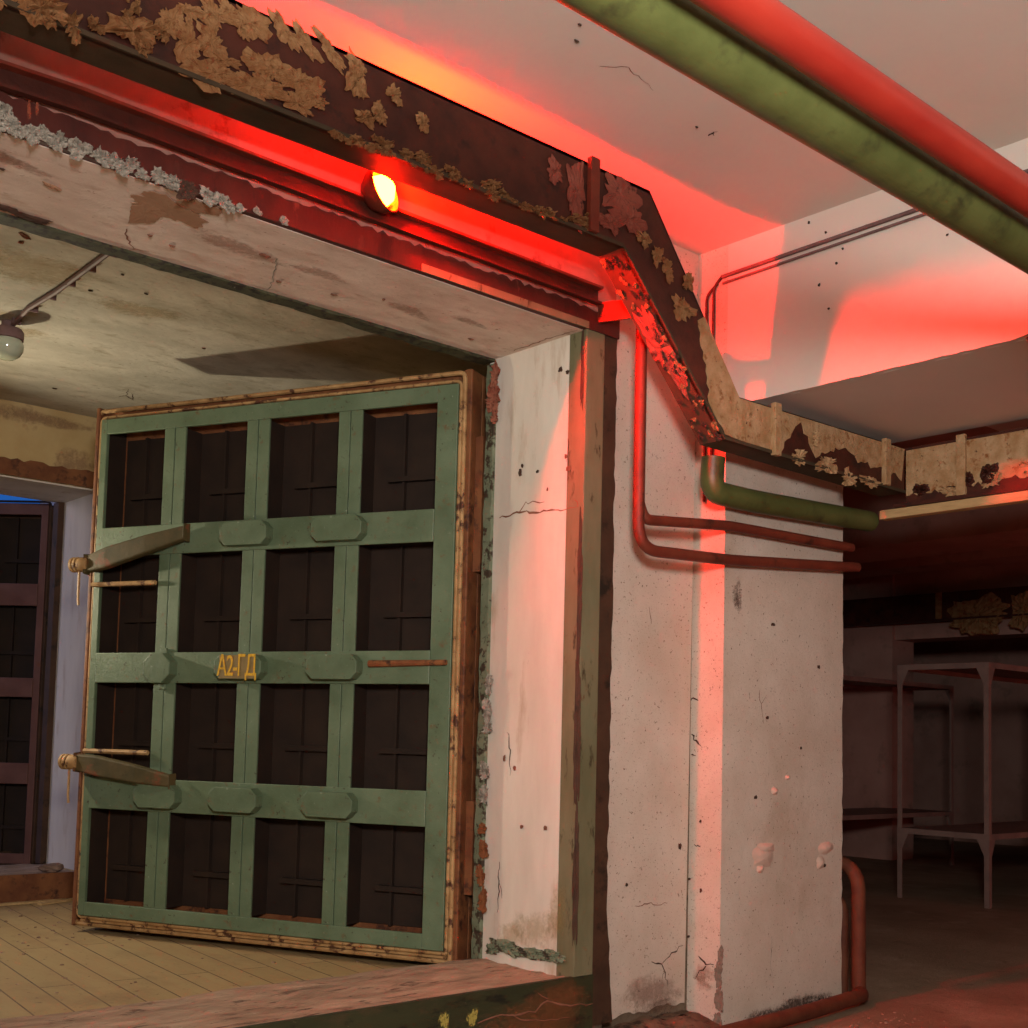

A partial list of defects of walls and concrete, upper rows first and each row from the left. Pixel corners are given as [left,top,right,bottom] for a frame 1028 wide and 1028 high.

peeling [0,0,698,322]
peeling [485,360,501,424]
peeling [558,330,584,410]
peeling [600,256,722,441]
crack [499,499,578,518]
peeling [791,431,881,489]
peeling [978,472,1002,489]
peeling [481,674,494,734]
peeling [485,507,583,963]
peeling [478,761,490,806]